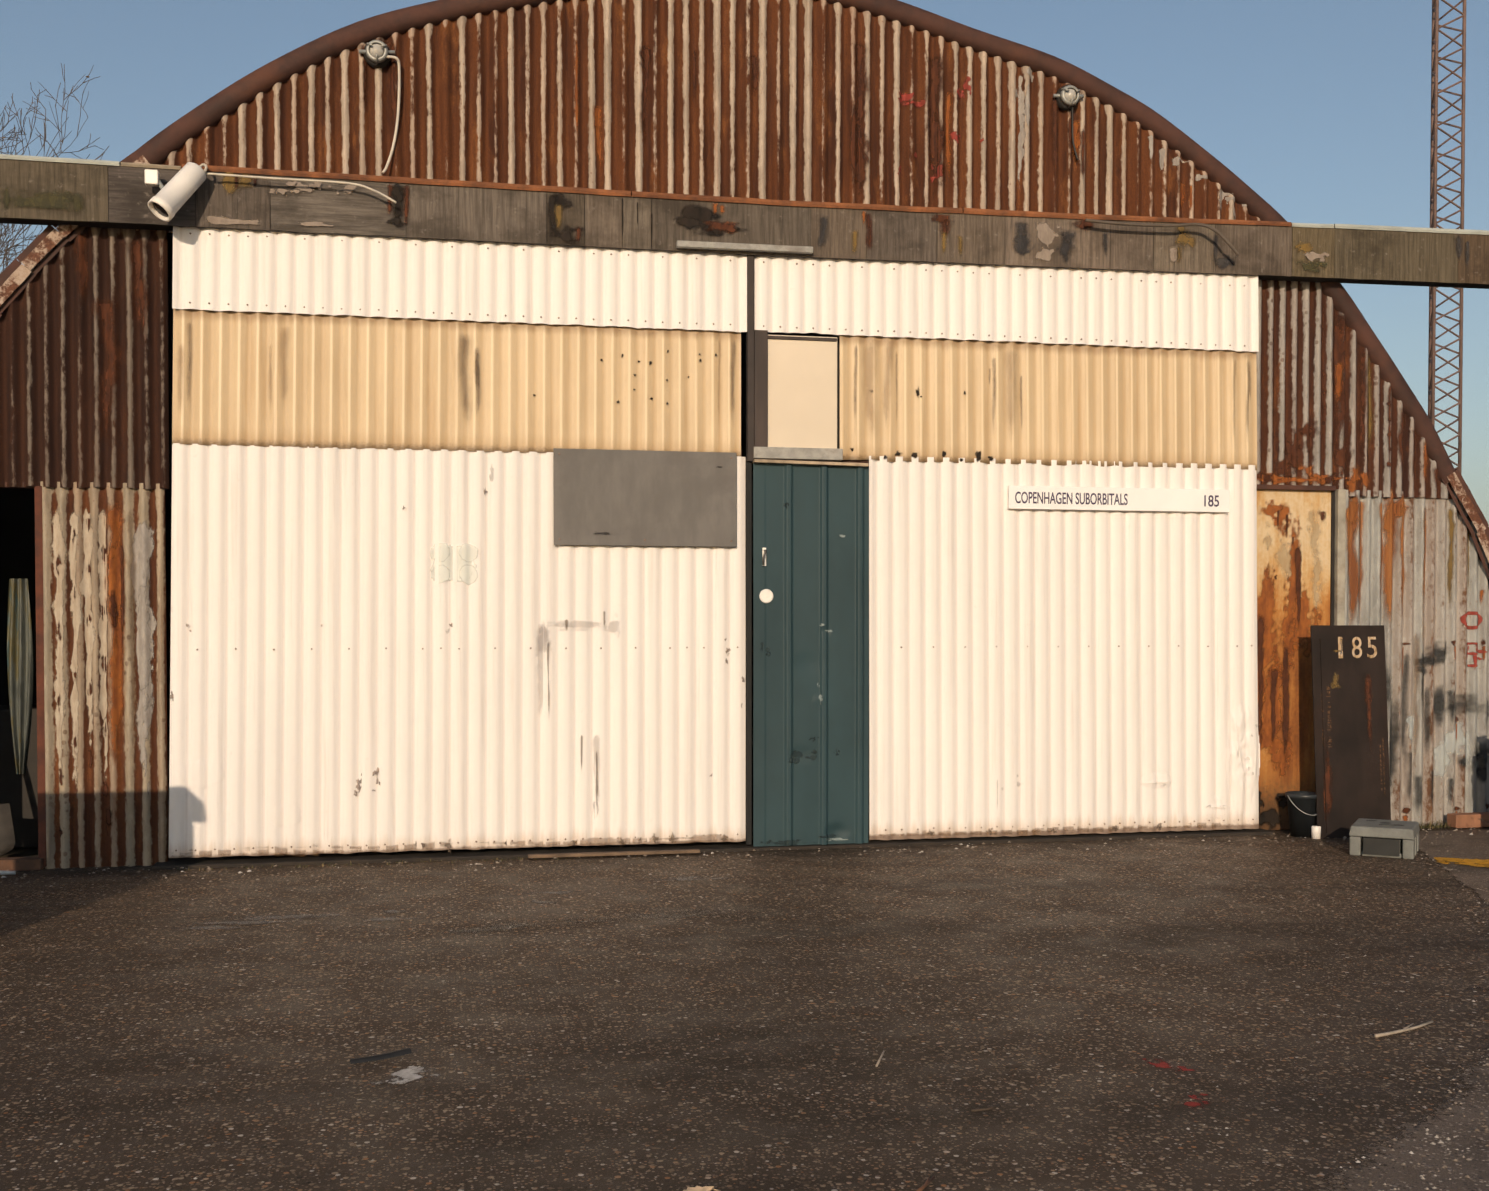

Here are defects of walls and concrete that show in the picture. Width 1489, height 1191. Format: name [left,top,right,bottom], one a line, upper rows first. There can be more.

corrosion [361,38,397,124]
corrosion [575,42,602,164]
corrosion [640,46,651,137]
corrosion [751,56,759,91]
corrosion [849,43,870,188]
corrosion [928,56,952,183]
corrosion [1170,227,1195,262]
corrosion [1256,309,1406,776]
corrosion [1447,509,1484,601]
peeling [50,509,109,797]
corrosion [105,505,124,769]
peeling [130,521,174,794]